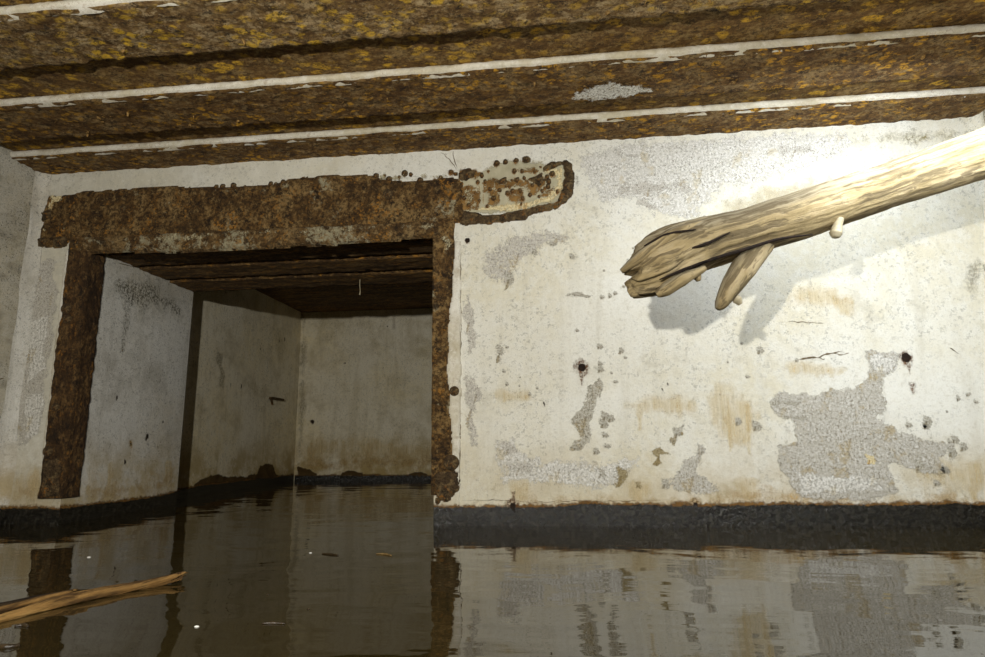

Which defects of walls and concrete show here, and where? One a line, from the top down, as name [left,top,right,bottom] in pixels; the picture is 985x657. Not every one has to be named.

rust [373,156,575,226]
rust [37,236,68,249]
peeling [496,344,539,396]
peeling [495,361,641,492]
peeling [652,424,684,466]
peeling [734,417,762,432]
peeling [770,349,968,501]
rust [41,458,62,497]
rust [435,470,460,505]
peeling [661,444,719,495]
damp [433,494,985,528]